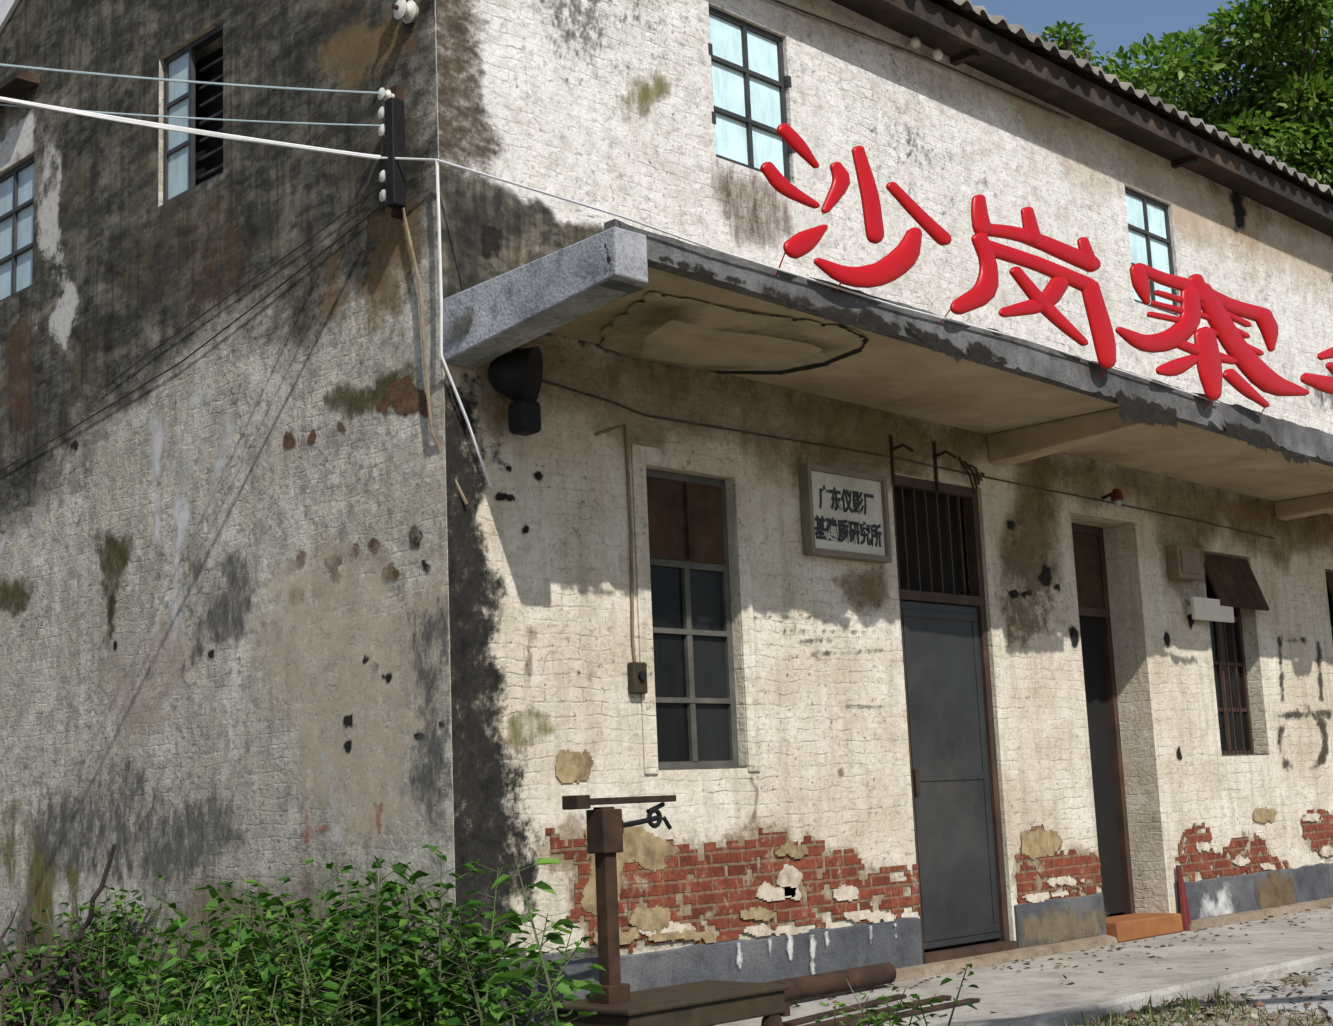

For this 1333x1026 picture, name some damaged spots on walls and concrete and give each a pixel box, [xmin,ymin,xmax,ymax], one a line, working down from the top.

damp [0,0,604,529]
flaking render [376,375,428,418]
damp [509,332,987,476]
damp [154,495,253,670]
damp [1120,472,1333,594]
damp [407,373,539,974]
damp [0,754,416,1019]
flaking render [543,817,598,958]
flaking render [616,816,921,953]
flaking render [1015,824,1102,905]
flaking render [1175,806,1289,882]
flaking render [1301,809,1333,860]